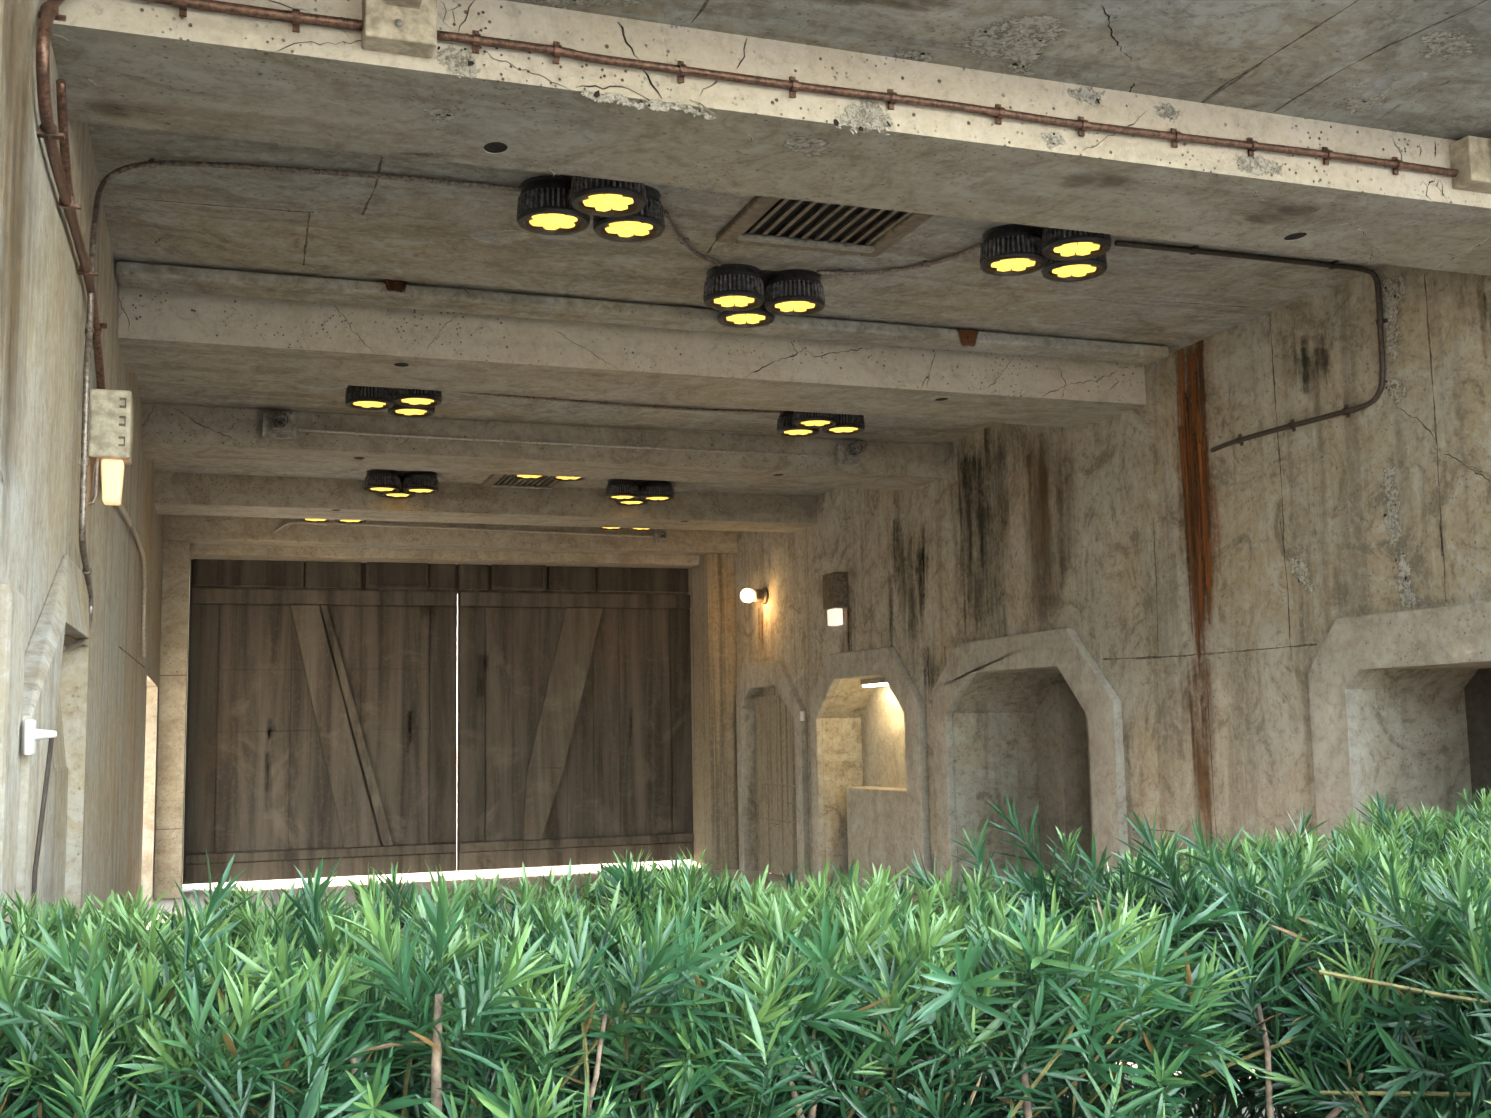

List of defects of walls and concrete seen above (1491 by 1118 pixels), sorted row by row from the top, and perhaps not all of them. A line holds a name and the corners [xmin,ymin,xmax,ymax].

crack [267,0,362,52]
crack [437,0,748,114]
water stain [958,428,1006,630]
rust [1176,340,1220,840]